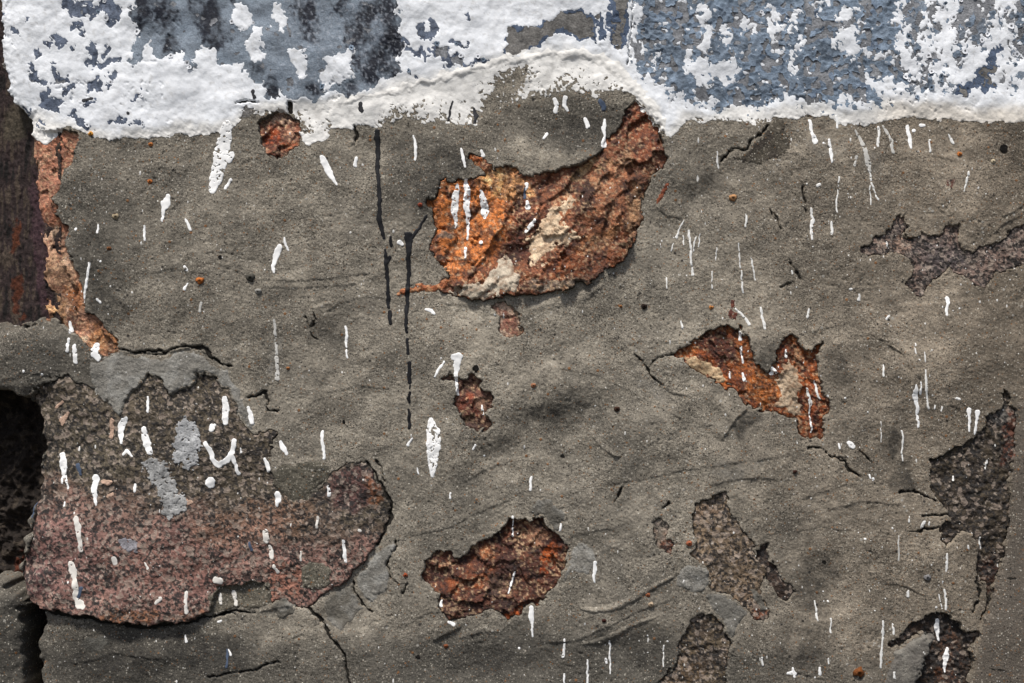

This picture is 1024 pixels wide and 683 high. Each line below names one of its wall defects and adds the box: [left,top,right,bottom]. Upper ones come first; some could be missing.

peeling [503,0,1024,116]
spalling [860,216,1024,297]
crack [115,345,232,367]
spalling [24,372,391,627]
spalling [690,491,794,620]
spalling [929,390,1017,606]
spalling [658,614,731,683]
spalling [888,612,979,683]